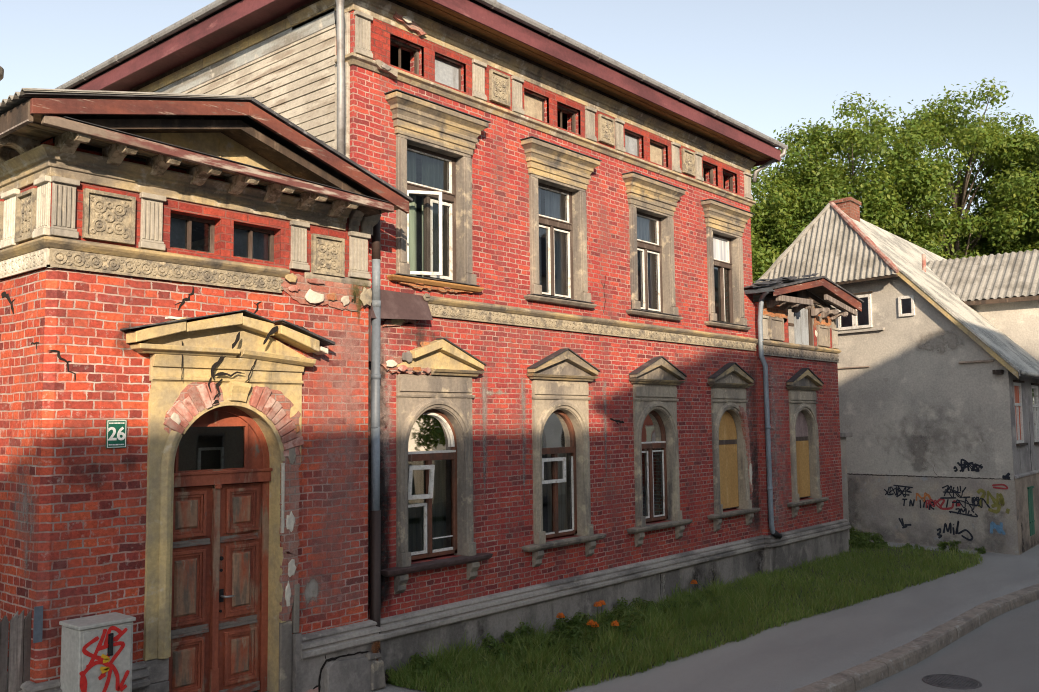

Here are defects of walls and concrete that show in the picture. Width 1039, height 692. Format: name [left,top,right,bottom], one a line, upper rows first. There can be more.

crack [1,291,15,314]
crack [175,287,194,310]
spalling [281,273,372,311]
crack [31,342,76,380]
crack [211,301,333,383]
spalling [249,386,304,621]
crack [313,651,369,692]